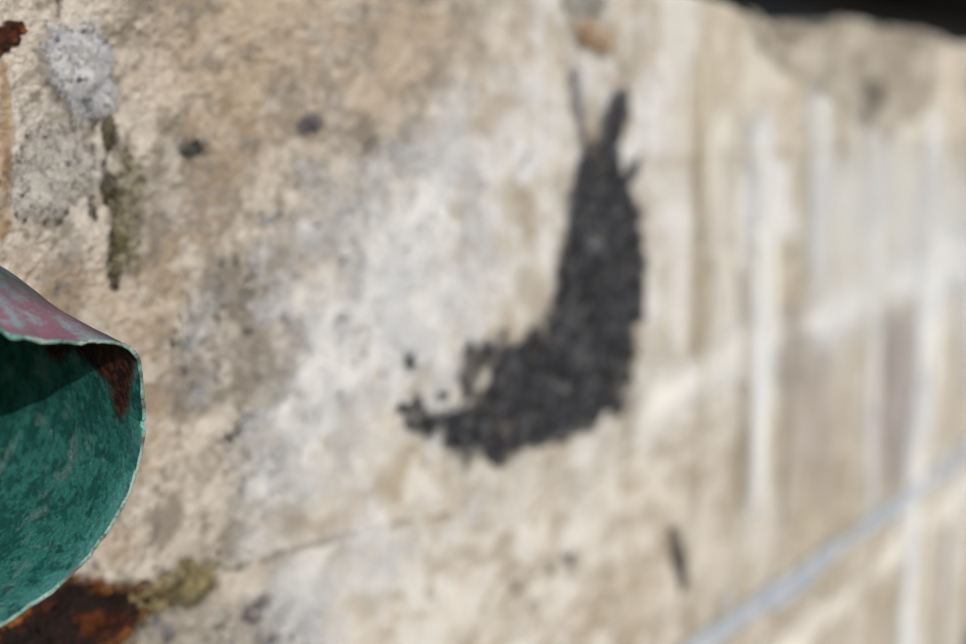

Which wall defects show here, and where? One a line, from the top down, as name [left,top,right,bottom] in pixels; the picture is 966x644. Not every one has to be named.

rust [0,63,11,198]
rust [0,577,168,644]